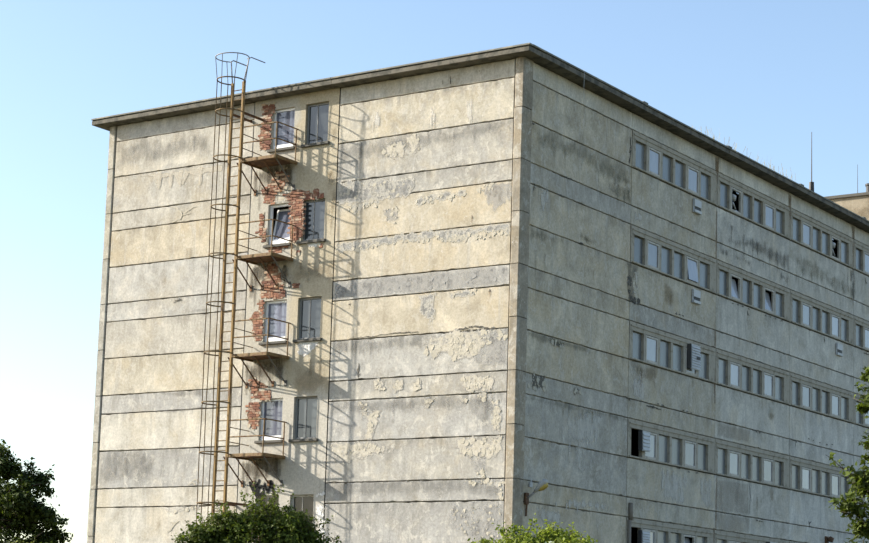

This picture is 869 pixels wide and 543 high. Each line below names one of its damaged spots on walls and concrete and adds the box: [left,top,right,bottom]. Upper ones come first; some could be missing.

spalling [258,102,276,151]
spalling [249,167,324,341]
peeling [297,341,319,356]